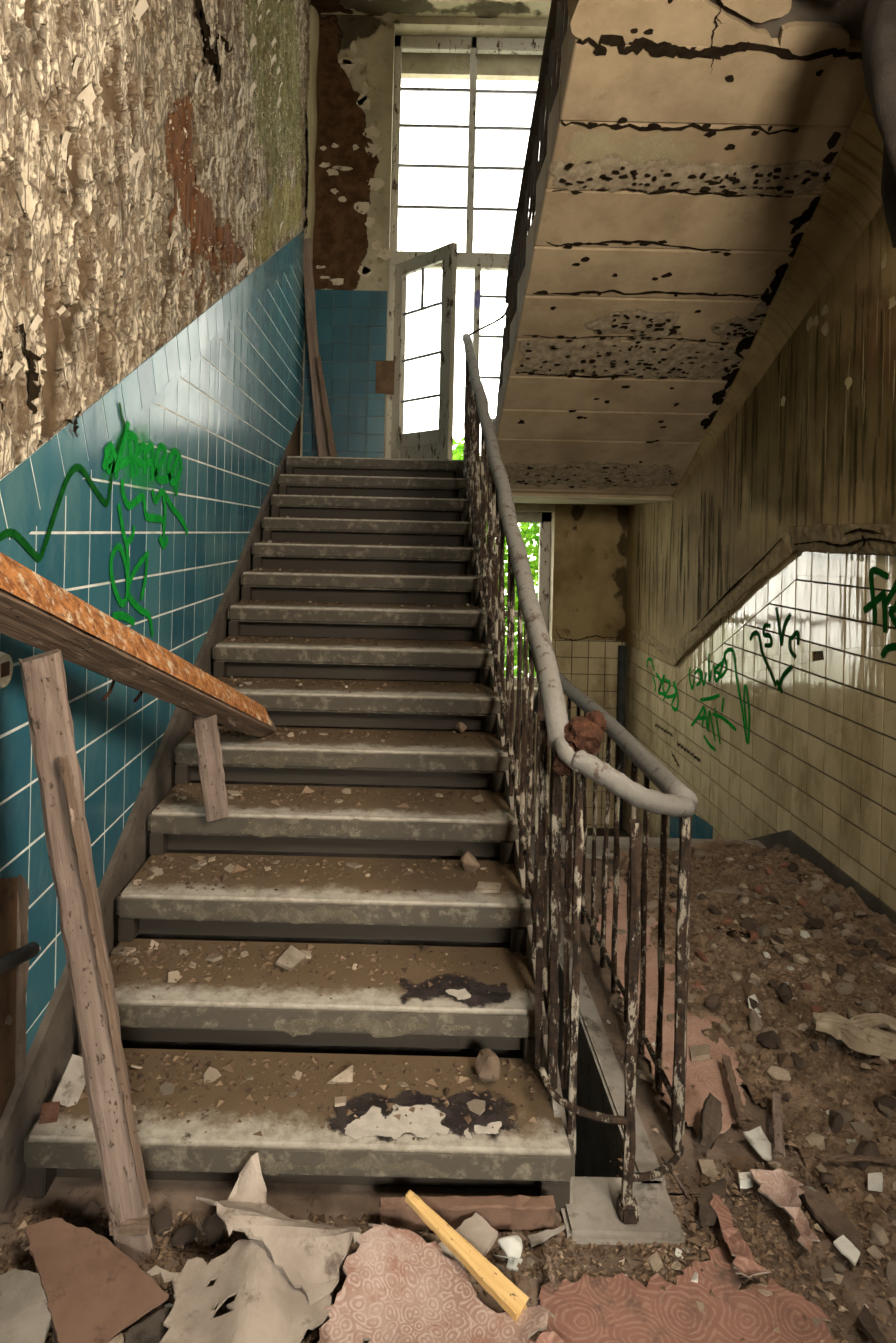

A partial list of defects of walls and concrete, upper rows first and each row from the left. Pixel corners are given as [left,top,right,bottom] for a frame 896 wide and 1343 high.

crack [576,6,862,74]
crack [561,120,799,136]
peeling [0,0,391,479]
leakage [612,286,896,644]
peeling [0,552,272,726]
peeling [446,988,471,1000]
peeling [262,1103,502,1178]